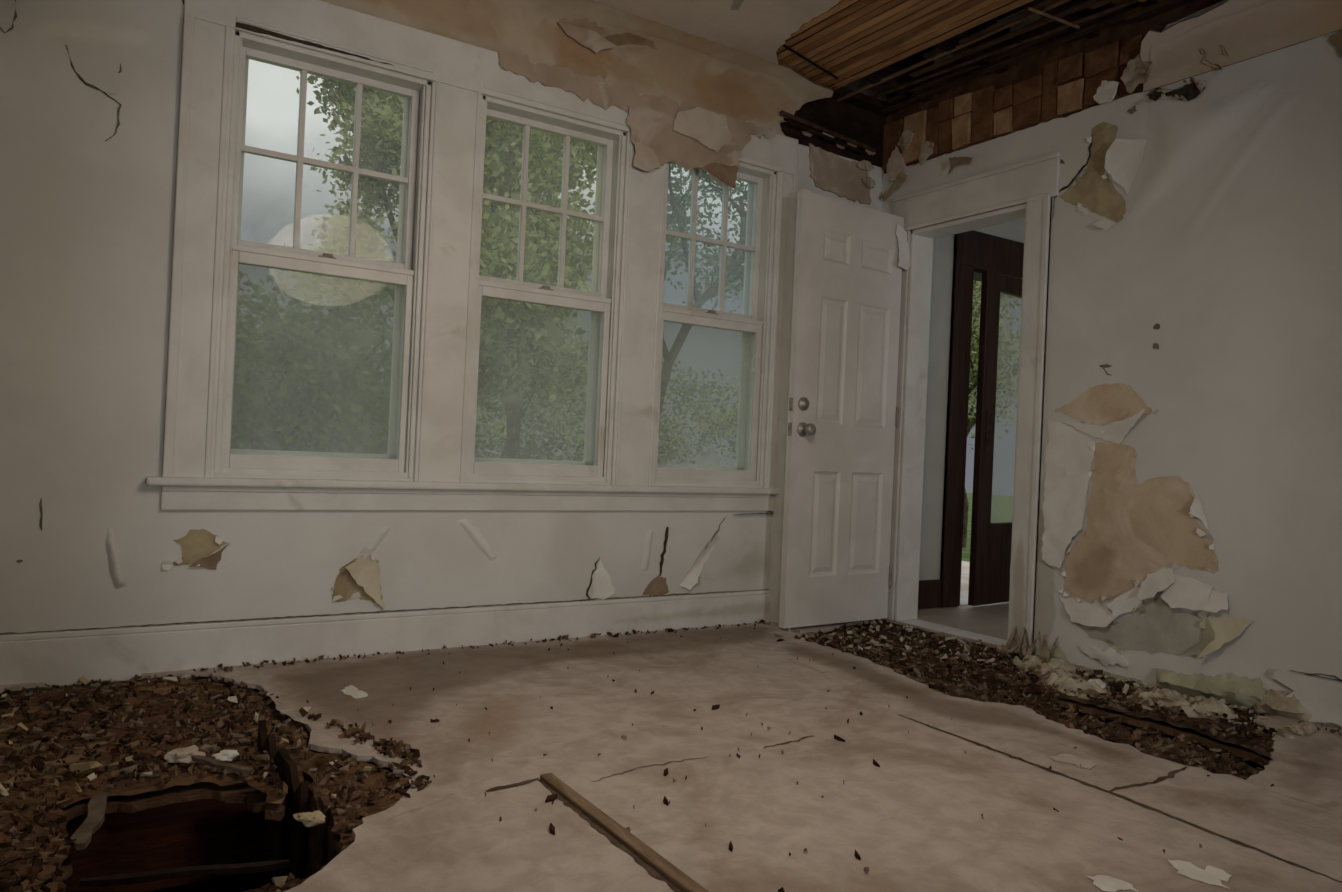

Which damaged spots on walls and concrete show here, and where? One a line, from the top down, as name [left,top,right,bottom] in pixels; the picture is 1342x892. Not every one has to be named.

crack [66,46,122,141]
damp [337,0,805,139]
flaking render [626,104,755,189]
flaking render [879,0,1228,201]
spalling [1052,122,1147,230]
damp [1145,0,1342,86]
spalling [161,529,230,570]
spalling [332,548,385,609]
spalling [642,516,726,596]
spalling [1017,365,1318,724]